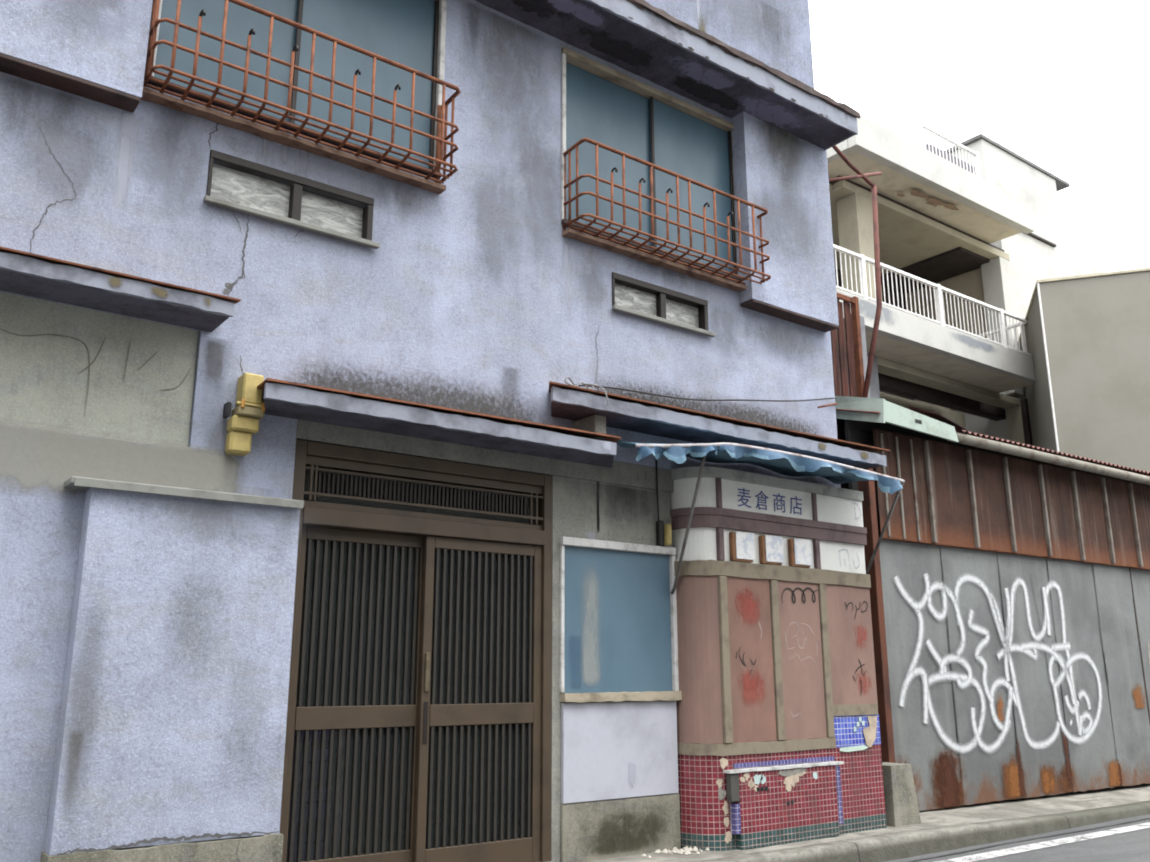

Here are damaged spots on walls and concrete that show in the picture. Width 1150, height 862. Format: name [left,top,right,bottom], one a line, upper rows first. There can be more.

crack [30,132,77,253]
crack [223,211,249,295]
leakage [310,375,529,421]
rust [1133,686,1145,709]
spalling [716,758,817,844]
rust [934,752,964,808]
rust [1003,745,1026,798]
rust [1041,734,1075,795]
rust [1108,762,1123,786]